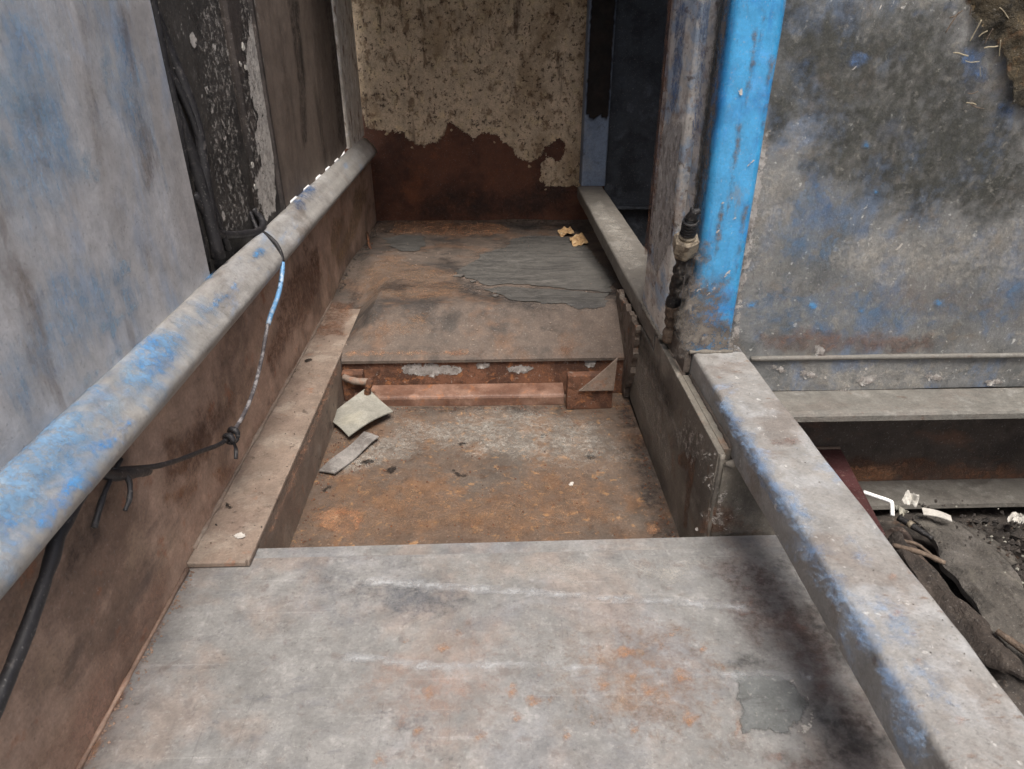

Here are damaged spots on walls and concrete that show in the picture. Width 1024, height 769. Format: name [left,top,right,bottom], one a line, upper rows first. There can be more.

peeling [351,0,587,190]
peeling [453,235,616,309]
peeling [732,671,814,734]